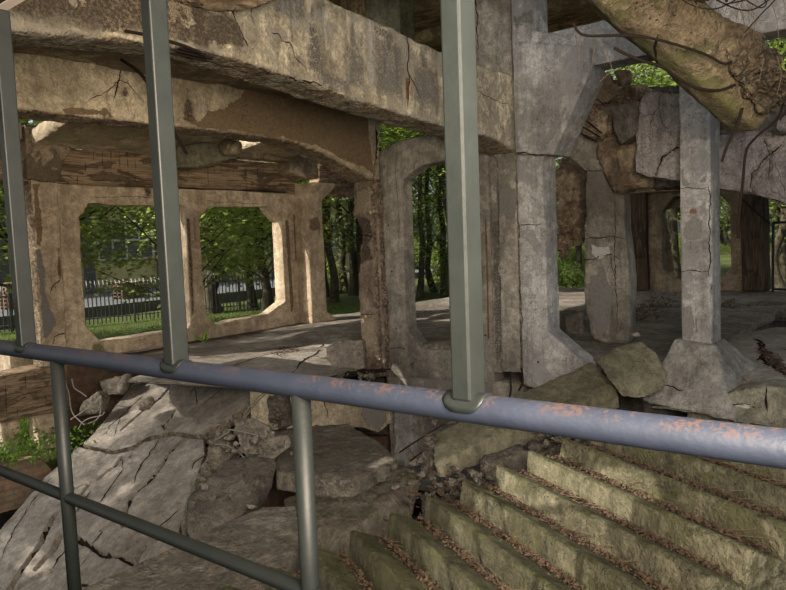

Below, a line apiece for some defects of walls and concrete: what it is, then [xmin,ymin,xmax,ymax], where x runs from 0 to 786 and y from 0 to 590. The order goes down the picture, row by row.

crack [85,70,145,103]
peeling [167,0,196,30]
peeling [169,10,251,61]
crack [200,33,335,91]
spalling [572,23,732,65]
spalling [613,47,736,92]
spalling [682,0,775,33]
crack [752,338,786,375]
crack [733,387,768,411]
crack [76,411,176,512]
crack [19,527,51,578]
crack [53,533,134,568]